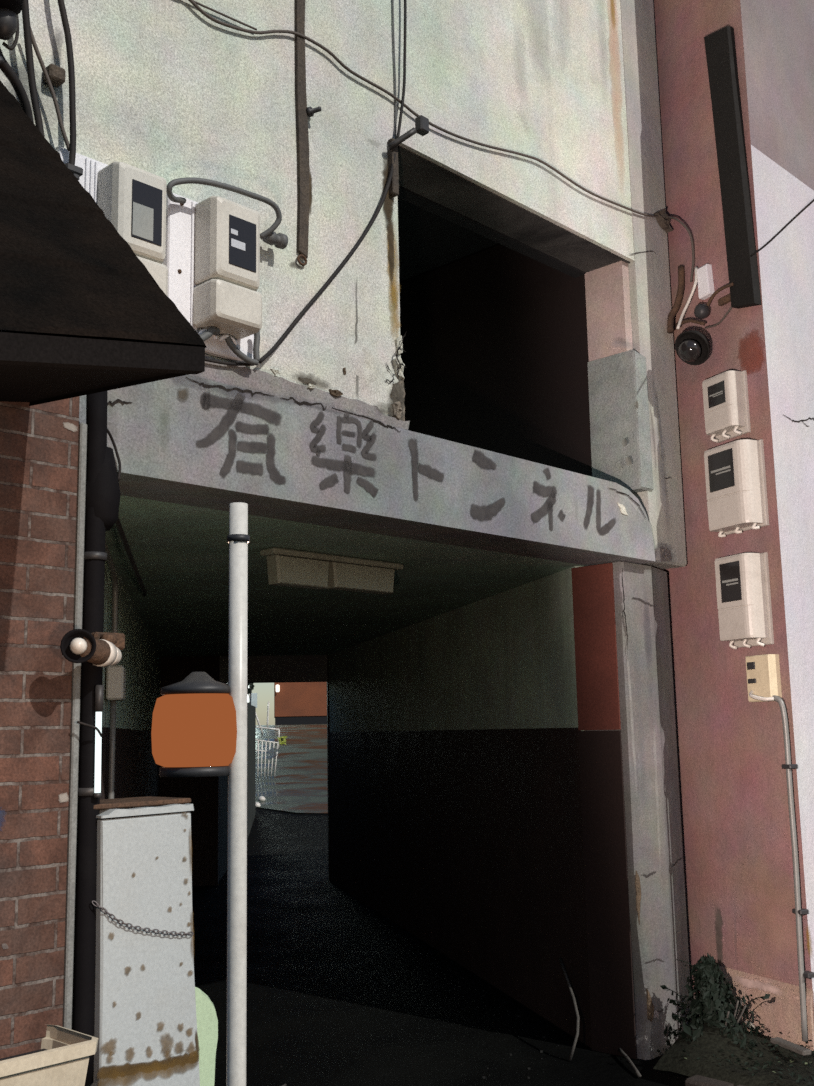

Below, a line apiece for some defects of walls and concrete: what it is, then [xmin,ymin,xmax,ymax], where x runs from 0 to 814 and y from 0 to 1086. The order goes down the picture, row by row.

rust [383,162,399,325]
flaking render [298,373,343,397]
spalling [380,336,405,421]